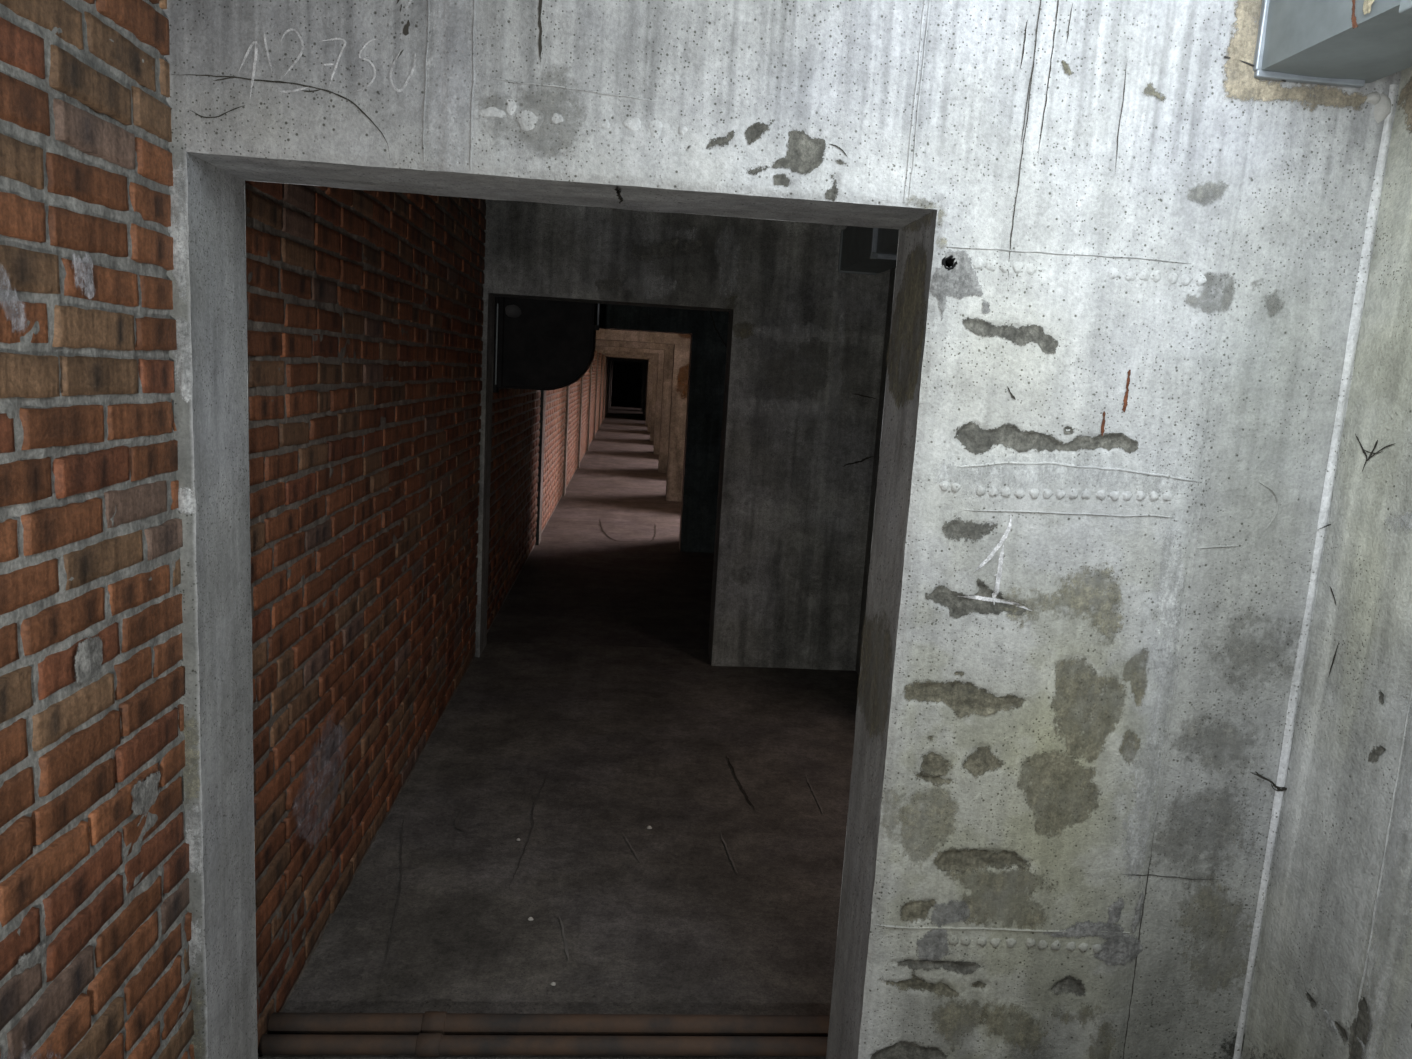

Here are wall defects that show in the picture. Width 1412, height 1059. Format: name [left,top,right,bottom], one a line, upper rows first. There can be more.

spalling [687,122,770,149]
spalling [747,129,847,201]
spalling [963,318,1059,354]
spalling [954,421,1138,455]
damp [1005,566,1124,644]
damp [947,864,1058,930]